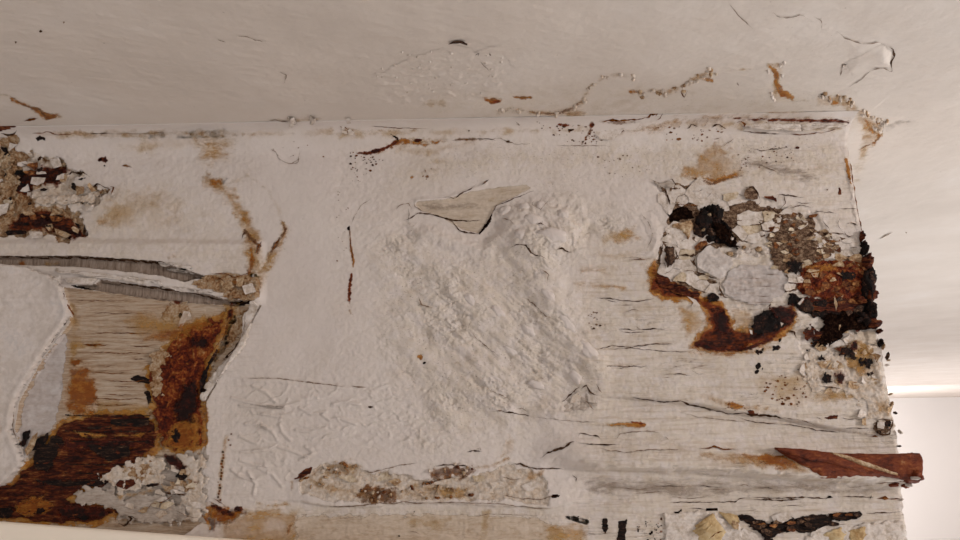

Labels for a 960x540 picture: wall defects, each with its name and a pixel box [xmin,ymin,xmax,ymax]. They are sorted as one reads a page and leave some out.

spalling [0,135,119,244]
leakage [684,146,800,185]
peeling [629,178,867,316]
spalling [0,264,261,535]
corrosion [136,301,237,455]
corrosion [202,433,243,530]
crack [493,408,678,455]
crack [600,298,702,378]
corrosion [647,261,798,356]
crack [631,397,843,433]
peeling [637,509,906,540]
corrosion [739,447,924,489]